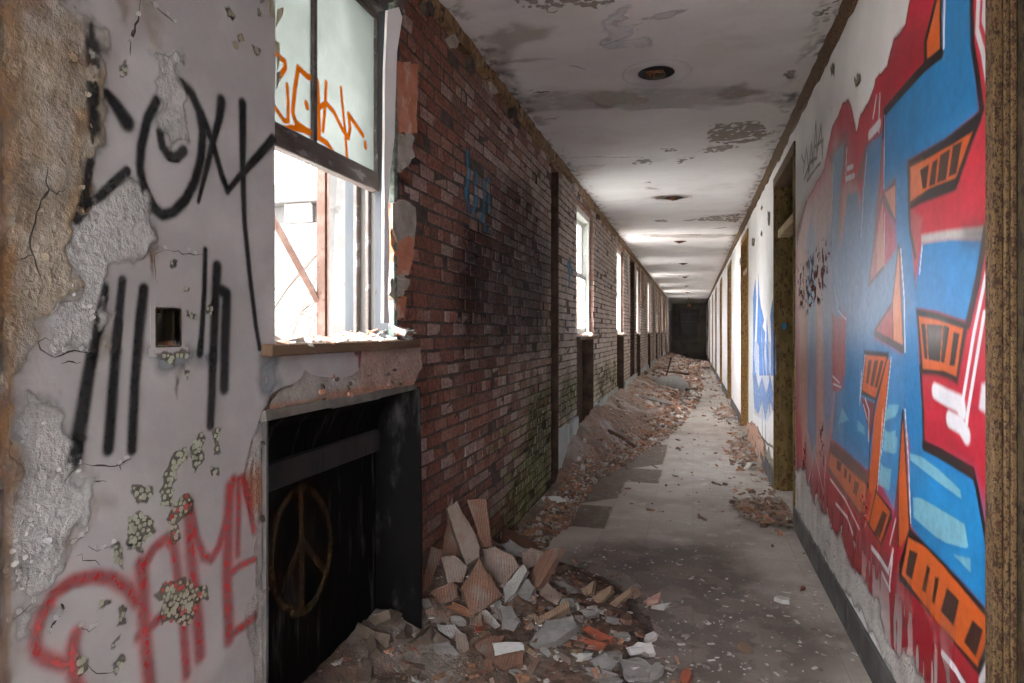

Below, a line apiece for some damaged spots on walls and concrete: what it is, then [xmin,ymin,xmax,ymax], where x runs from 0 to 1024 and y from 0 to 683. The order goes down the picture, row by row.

peeling [155,51,189,149]
peeling [660,121,771,164]
crack [14,167,64,280]
spalling [267,7,422,410]
spalling [0,0,158,640]
peeling [111,428,221,568]
peeling [154,577,209,626]